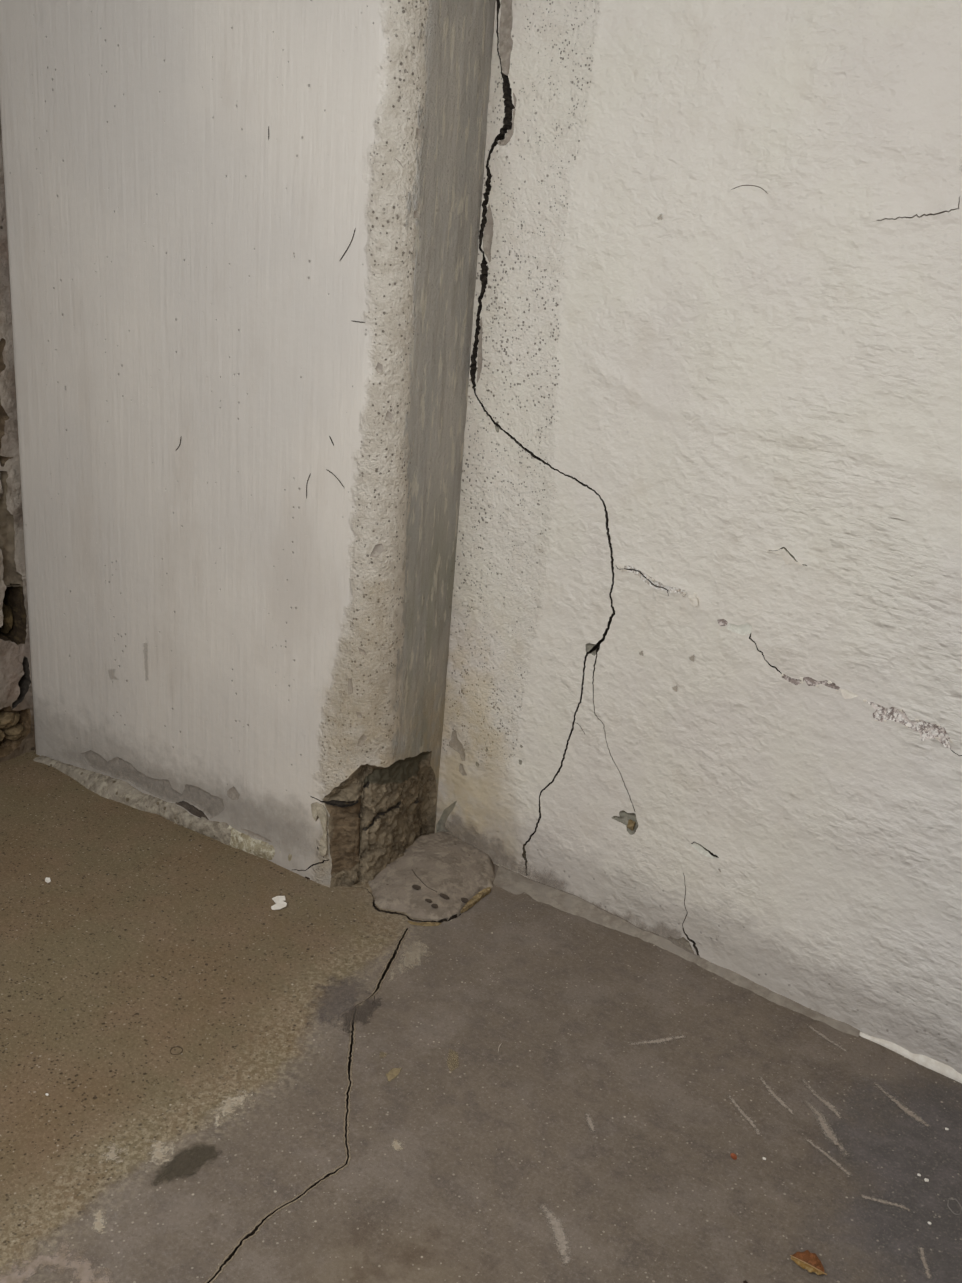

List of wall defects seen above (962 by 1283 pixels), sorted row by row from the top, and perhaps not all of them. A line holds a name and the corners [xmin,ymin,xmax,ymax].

crack [470,0,962,876]
flaking render [0,399,27,645]
flaking render [0,706,31,758]
peeling [81,750,240,820]
spalling [310,751,457,888]
peeling [449,730,488,776]
crack [204,860,463,1283]
leakage [149,1141,218,1185]